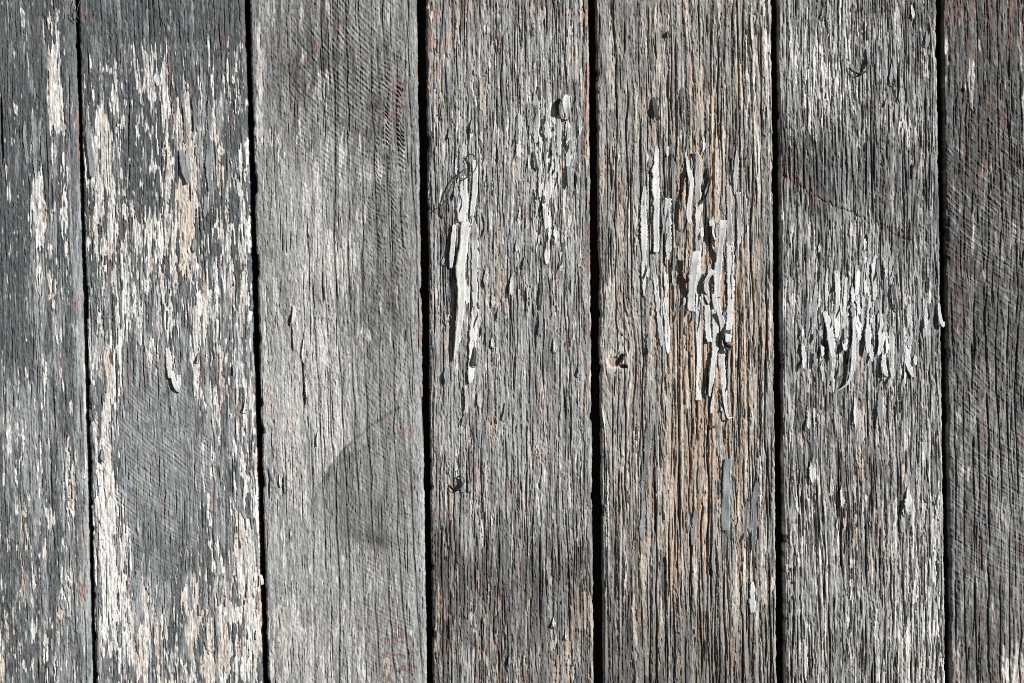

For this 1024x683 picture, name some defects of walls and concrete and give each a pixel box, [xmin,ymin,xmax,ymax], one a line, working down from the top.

peeling [84,20,275,393]
peeling [439,119,501,425]
peeling [509,84,586,335]
peeling [636,0,871,429]
peeling [801,238,945,431]
peeling [0,386,77,683]
peeling [42,352,389,683]